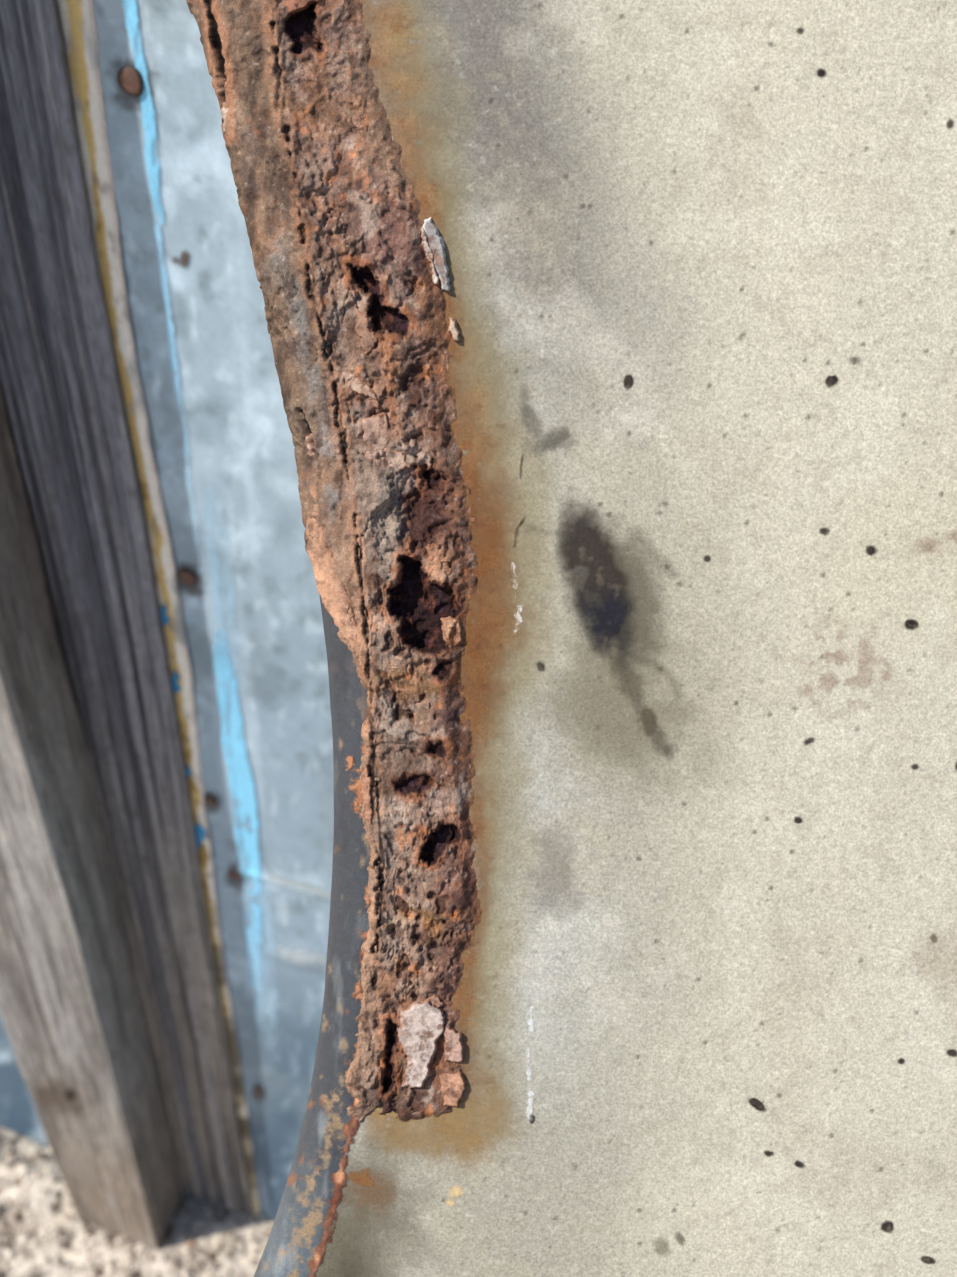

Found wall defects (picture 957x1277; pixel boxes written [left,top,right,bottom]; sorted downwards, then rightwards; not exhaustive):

rust [172,252,189,267]
rust [176,565,200,595]
rust [186,0,523,1277]
water stain [641,709,656,735]